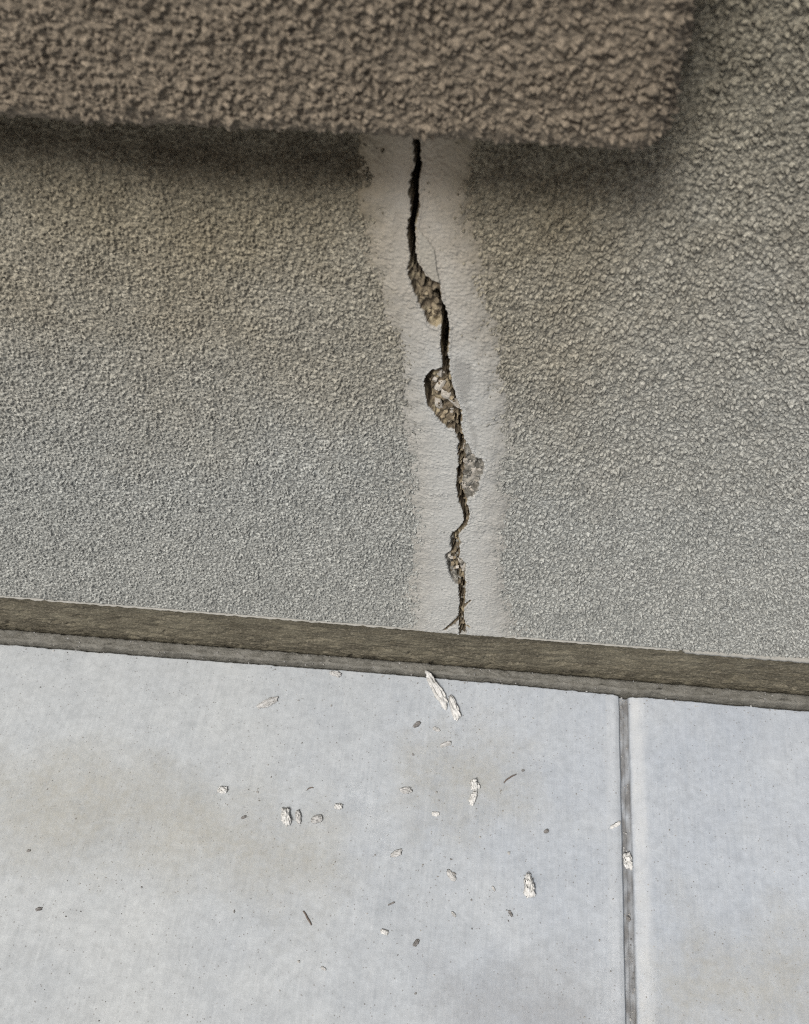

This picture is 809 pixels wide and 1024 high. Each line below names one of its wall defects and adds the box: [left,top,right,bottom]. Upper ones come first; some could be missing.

flaking render [403,229,446,331]
crack [403,135,474,635]
flaking render [422,354,488,505]
flaking render [442,529,469,587]